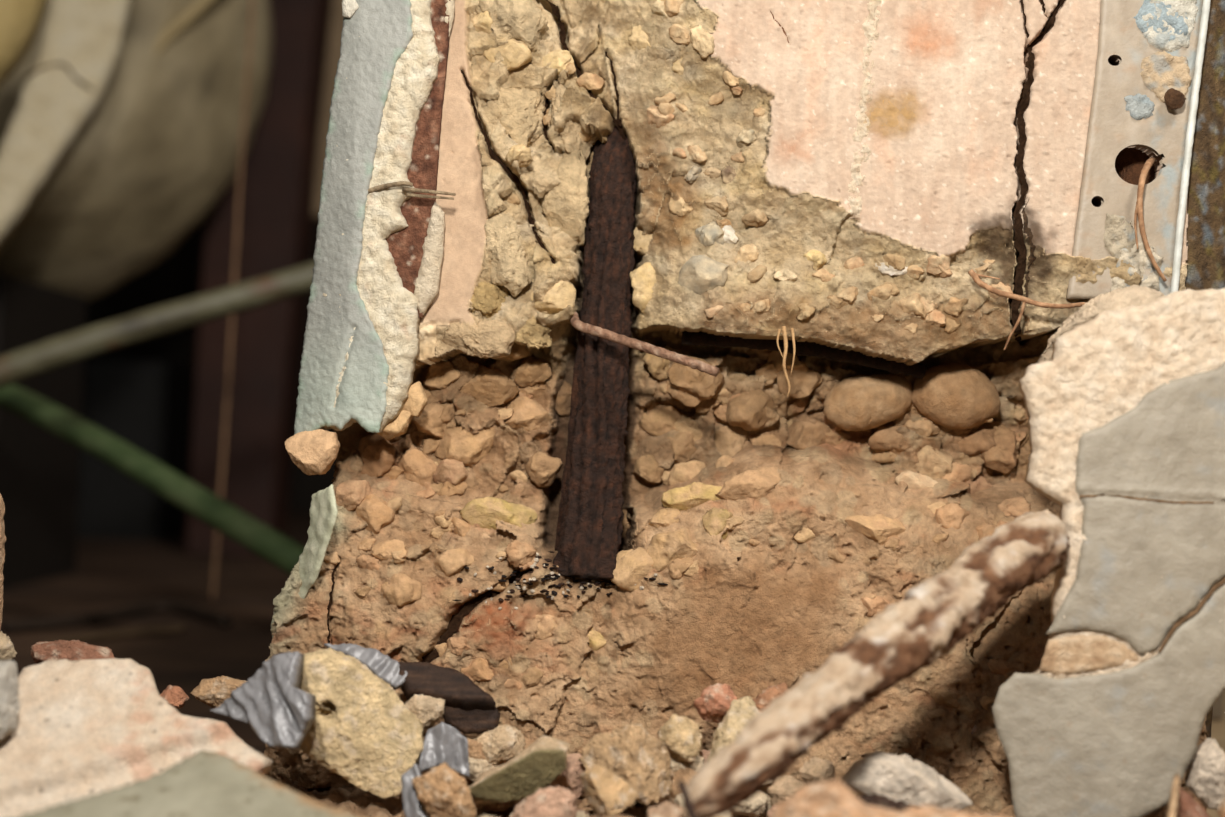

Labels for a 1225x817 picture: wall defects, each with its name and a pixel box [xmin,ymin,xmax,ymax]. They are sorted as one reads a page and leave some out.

crack [542,0,626,150]
crack [461,70,555,264]
crack [1010,0,1065,342]
spalling [265,0,1198,755]
spalling [264,743,355,789]
spalling [785,569,1139,814]
spalling [1145,803,1169,817]
spalling [1179,771,1208,814]
spalling [1197,715,1207,746]